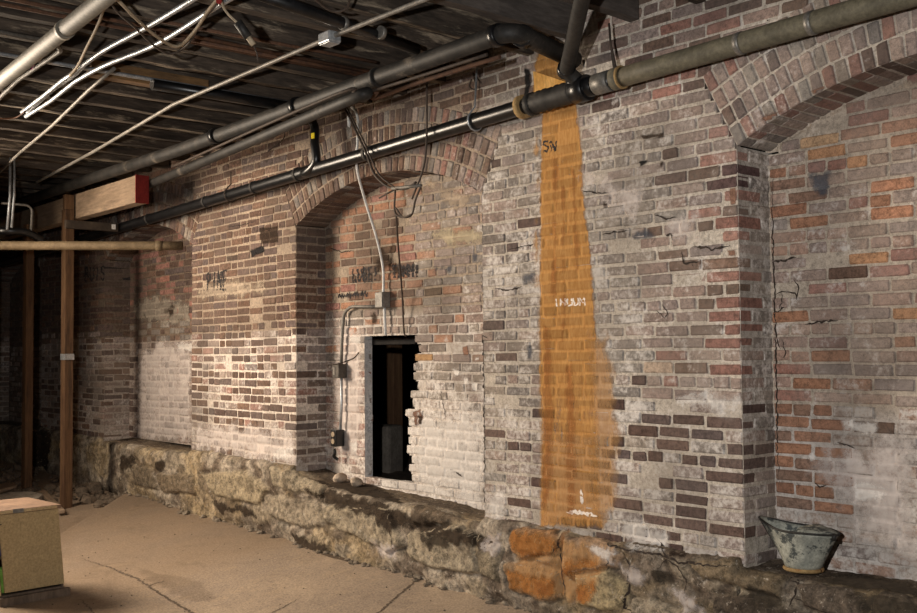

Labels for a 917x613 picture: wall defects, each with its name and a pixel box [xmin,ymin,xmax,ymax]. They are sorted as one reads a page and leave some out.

crack [771,181,799,482]
spalling [409,410,423,425]
crack [82,558,194,613]
crack [376,581,415,613]
crack [551,529,569,595]
crack [606,533,728,613]